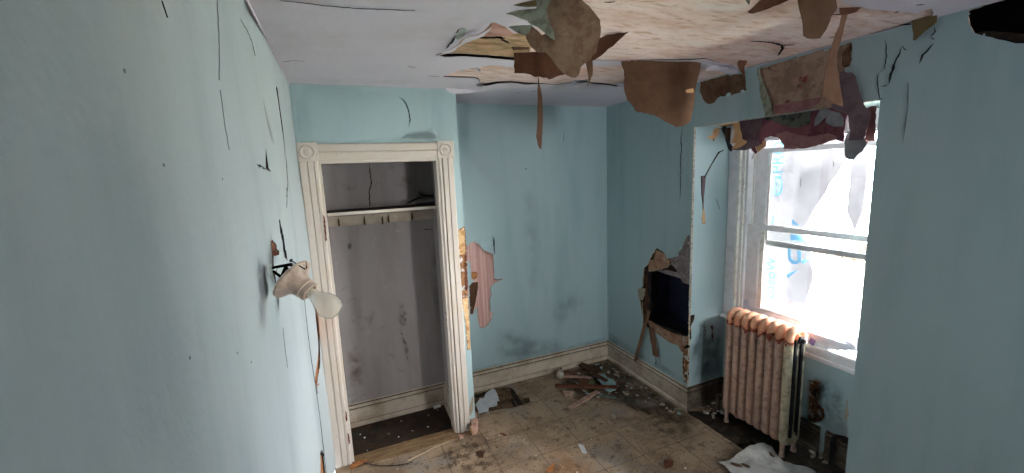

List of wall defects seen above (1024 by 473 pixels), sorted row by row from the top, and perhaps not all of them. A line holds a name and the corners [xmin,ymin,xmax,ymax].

crack [217,0,255,150]
crack [877,4,936,140]
crack [257,161,288,259]
peeling [458,227,502,350]
spalling [638,235,692,382]